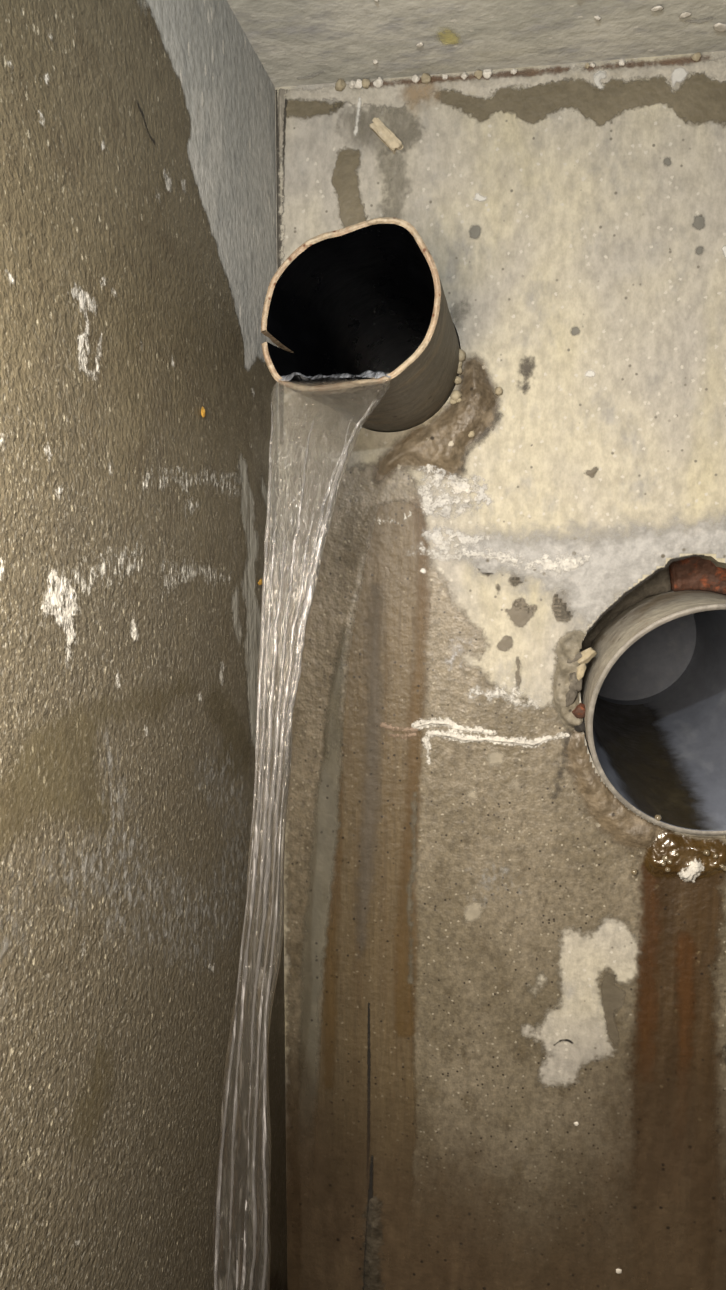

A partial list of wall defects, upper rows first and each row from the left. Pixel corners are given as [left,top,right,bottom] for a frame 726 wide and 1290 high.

damp [283,99,421,228]
damp [434,68,726,126]
damp [0,0,277,1290]
crack [362,1003,383,1290]
damp [268,464,726,1290]
corrosion [629,861,726,1165]